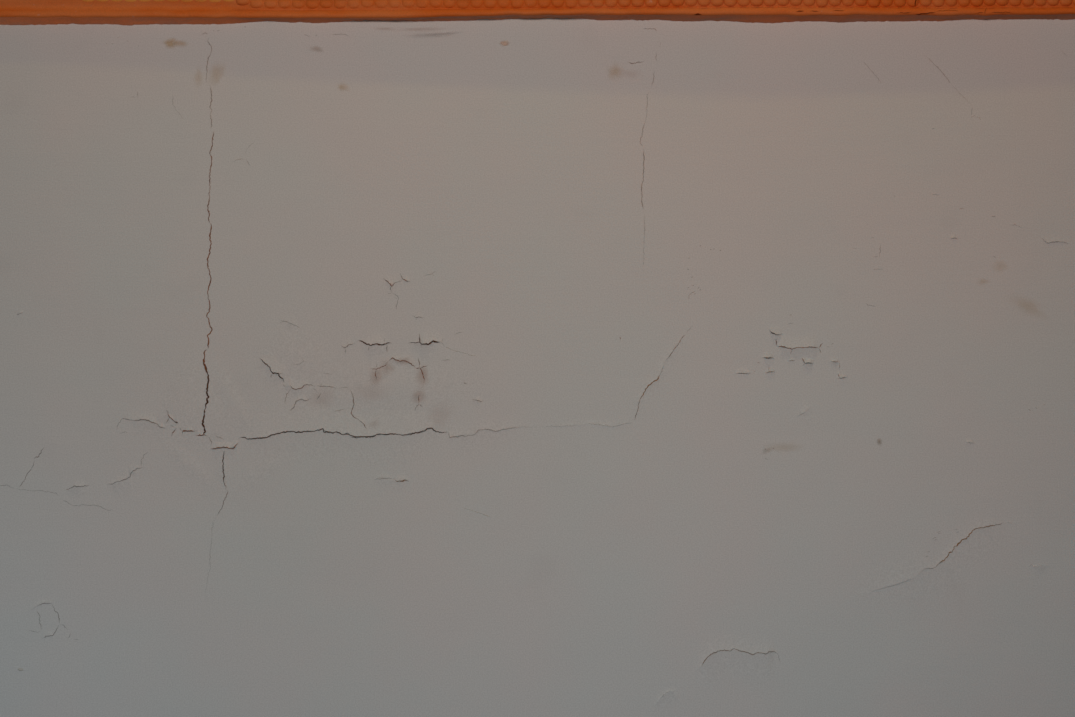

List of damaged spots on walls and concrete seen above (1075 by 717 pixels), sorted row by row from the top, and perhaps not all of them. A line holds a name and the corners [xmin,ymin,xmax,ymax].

crack [200,94,214,434]
peeling [253,352,311,400]
peeling [341,325,444,376]
crack [631,333,688,422]
peeling [762,324,848,382]
crack [213,360,541,512]
crack [847,514,1009,613]
peeling [692,629,778,696]